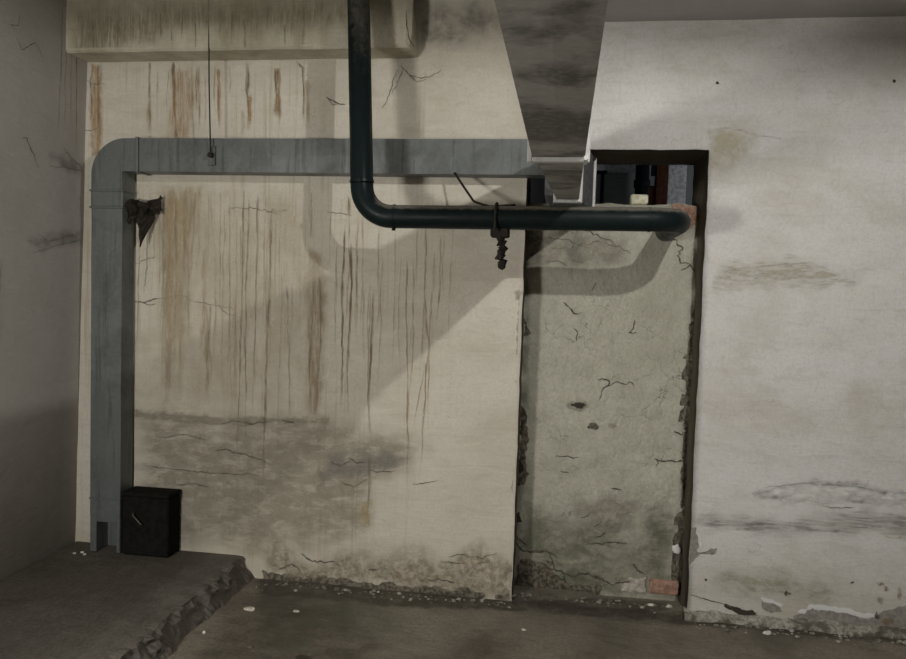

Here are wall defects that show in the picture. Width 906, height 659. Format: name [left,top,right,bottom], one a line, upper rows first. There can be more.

corrosion [85,65,105,153]
corrosion [168,63,200,135]
crack [382,66,441,108]
water stain [239,206,258,379]
water stain [341,235,357,366]
crack [598,378,635,400]
water stain [134,365,403,540]
spalling [518,406,529,486]
spalling [262,545,601,601]
crack [516,533,645,586]
peeling [760,597,783,613]
peeling [793,604,906,628]